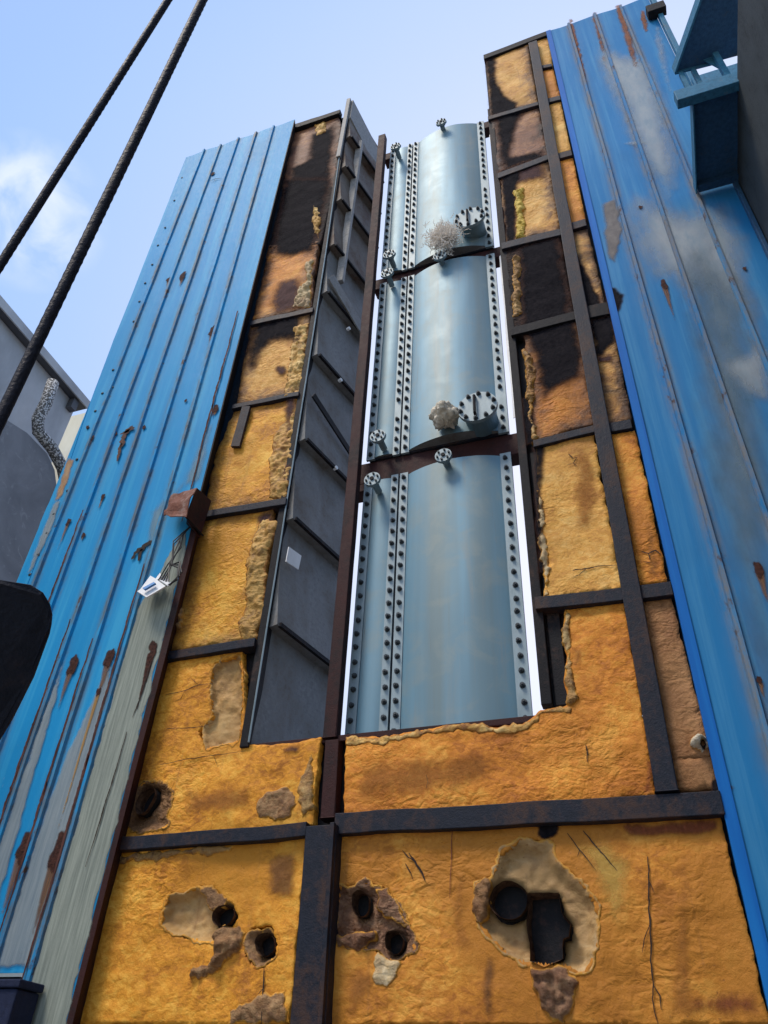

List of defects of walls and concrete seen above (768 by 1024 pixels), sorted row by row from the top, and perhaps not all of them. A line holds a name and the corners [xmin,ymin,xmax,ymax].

corrosion [615,5,636,65]
corrosion [661,279,673,312]
corrosion [190,311,238,490]
corrosion [56,459,73,499]
corrosion [48,510,86,602]
corrosion [139,640,157,698]
spalling [202,654,249,751]
corrosion [0,619,93,932]
corrosion [22,563,145,979]
peeling [0,533,186,1024]
crack [567,831,616,870]
crack [642,857,661,1023]